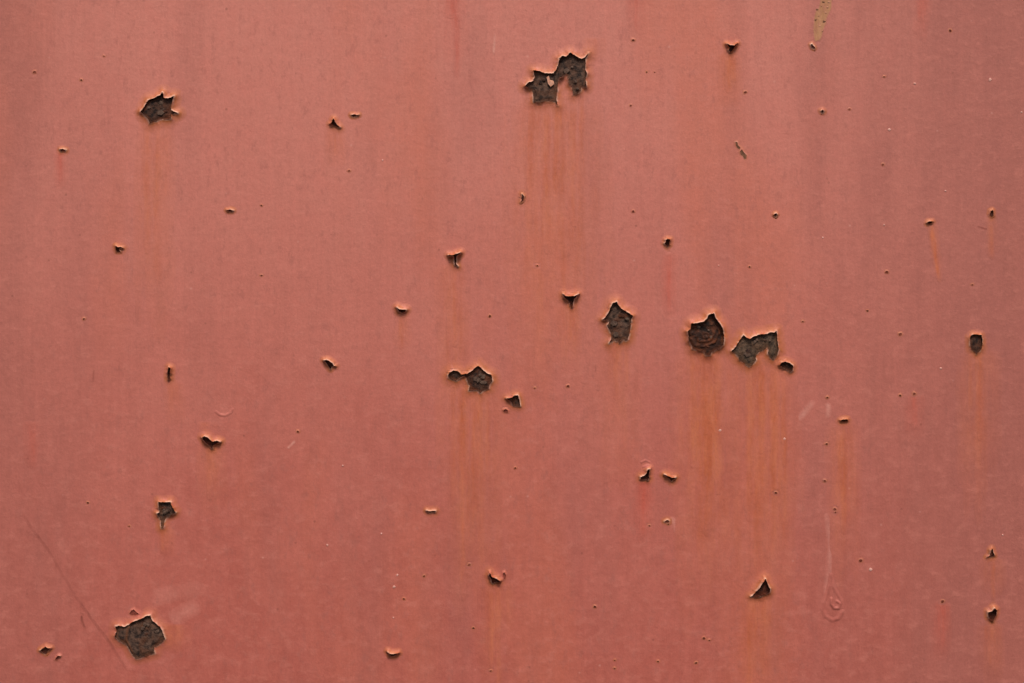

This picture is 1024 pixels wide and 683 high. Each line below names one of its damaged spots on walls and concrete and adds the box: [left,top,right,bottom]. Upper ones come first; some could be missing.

peeling [516,44,595,108]
peeling [133,84,187,125]
peeling [599,293,641,345]
peeling [678,304,795,375]
peeling [964,329,987,357]
peeling [446,359,496,395]
rust [424,92,617,683]
peeling [151,495,182,530]
rust [633,346,806,683]
peeling [748,575,772,599]
peeling [107,606,168,665]